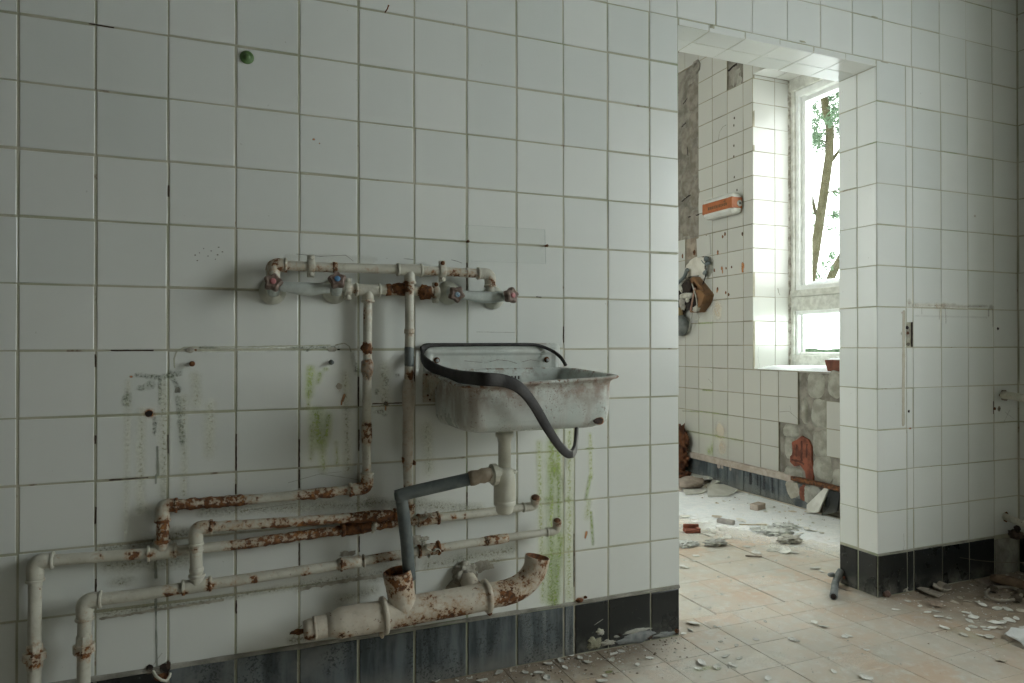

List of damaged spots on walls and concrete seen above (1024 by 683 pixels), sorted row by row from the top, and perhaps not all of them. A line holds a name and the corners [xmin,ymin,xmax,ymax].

spalling [678,59,701,280]
spalling [780,370,840,509]